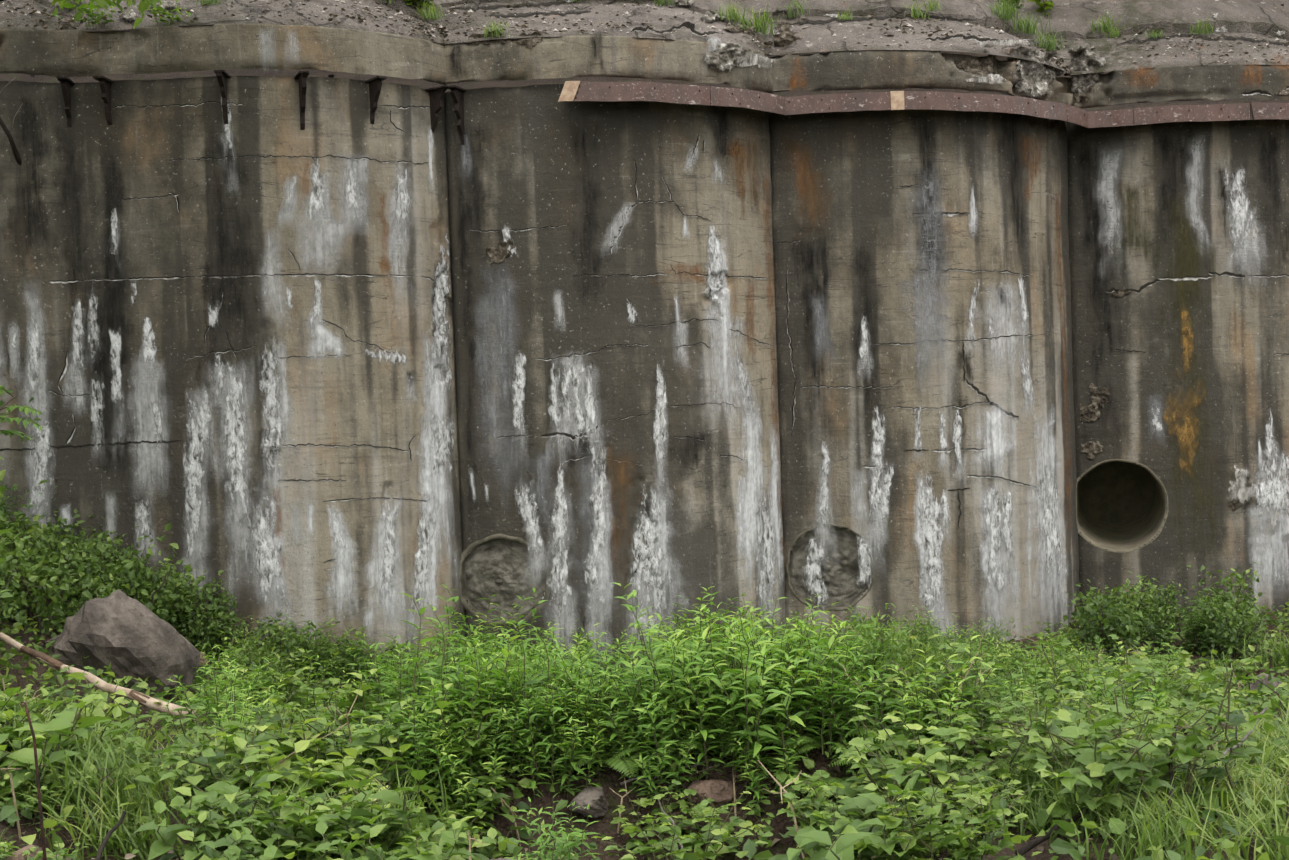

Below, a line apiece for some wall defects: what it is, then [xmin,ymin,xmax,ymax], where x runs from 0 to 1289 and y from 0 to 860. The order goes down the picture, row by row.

spalling [926,34,1111,103]
water stain [62,145,164,482]
water stain [183,97,391,607]
water stain [408,129,485,624]
spalling [470,224,567,264]
water stain [515,363,670,666]
crack [534,160,1034,435]
water stain [915,410,963,645]
crack [861,448,1037,527]
spalling [1080,383,1110,422]
crack [1105,271,1289,297]
peeling [1228,410,1289,588]